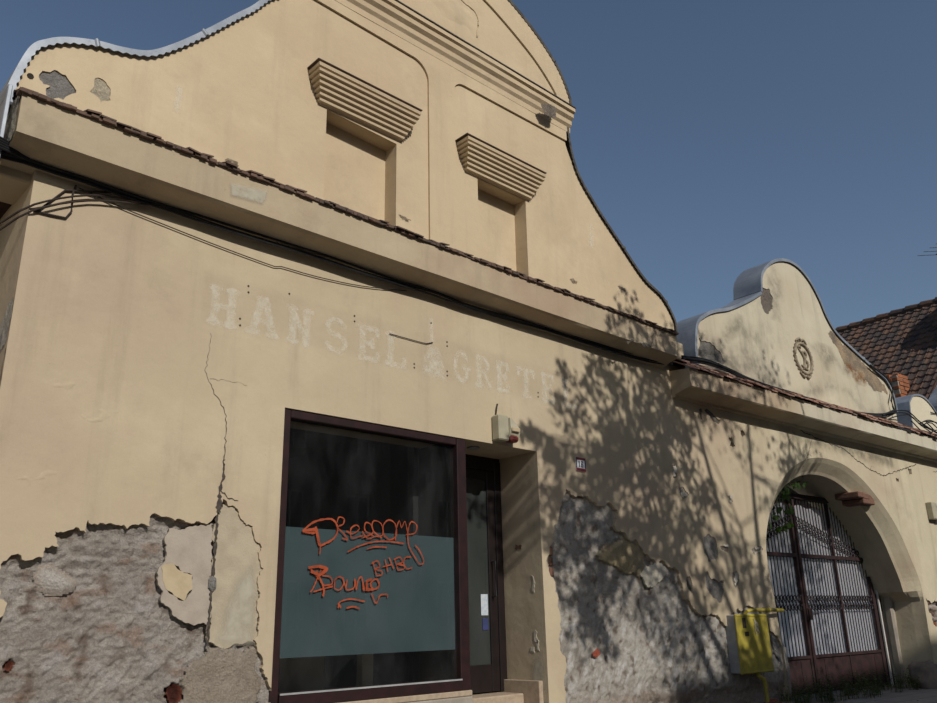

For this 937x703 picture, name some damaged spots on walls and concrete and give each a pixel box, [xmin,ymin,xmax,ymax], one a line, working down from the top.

flaking render [27,71,76,99]
peeling [90,78,110,102]
flaking render [760,288,772,314]
flaking render [698,339,724,365]
crack [205,333,238,646]
peeling [640,562,666,588]
flaking render [703,534,740,603]
flaking render [166,684,182,703]